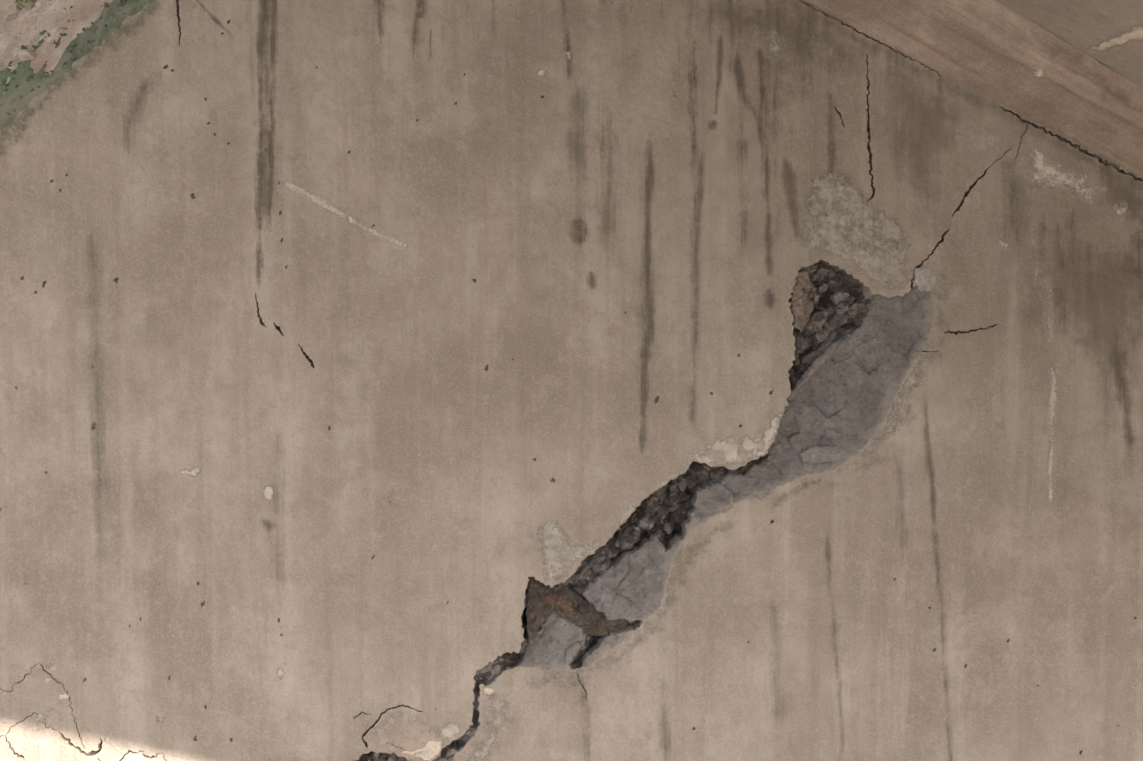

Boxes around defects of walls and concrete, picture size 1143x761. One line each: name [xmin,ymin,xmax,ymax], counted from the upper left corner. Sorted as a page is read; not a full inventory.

damp [258,0,276,63]
peeling [1090,27,1143,51]
crack [802,0,941,205]
damp [258,101,274,220]
damp [1015,150,1107,342]
crack [255,293,315,368]
damp [640,159,654,451]
spalling [656,414,781,488]
crack [354,106,1143,761]
spalling [538,501,638,579]
crack [0,663,167,761]
peeling [353,704,460,761]